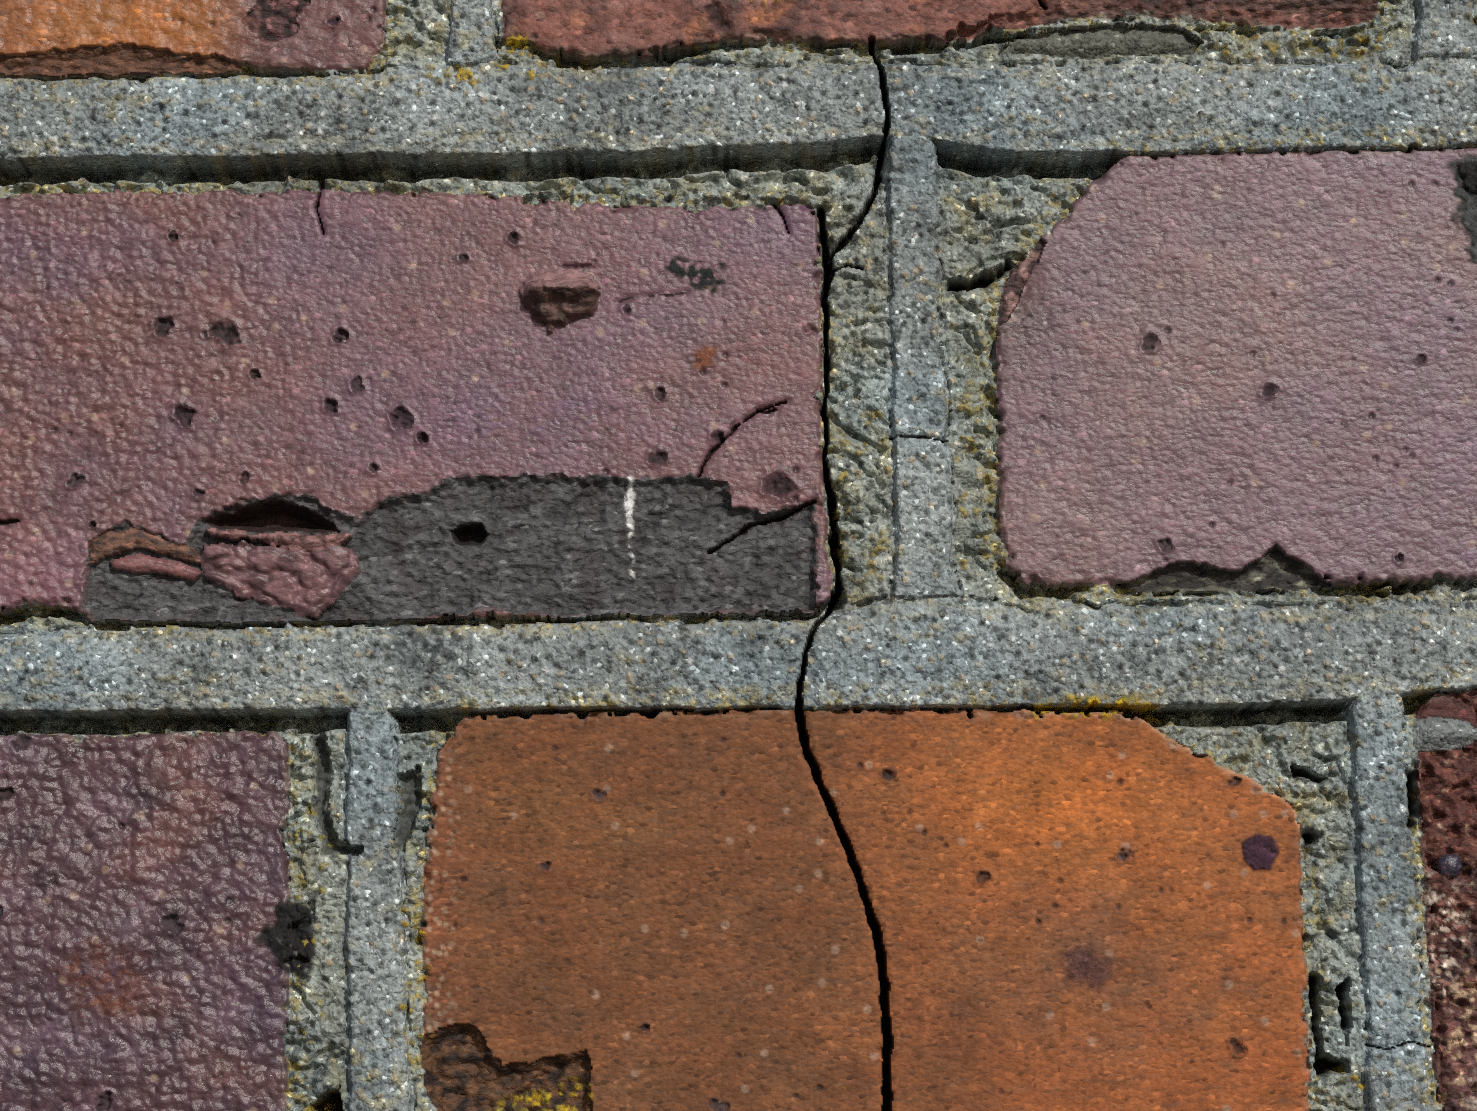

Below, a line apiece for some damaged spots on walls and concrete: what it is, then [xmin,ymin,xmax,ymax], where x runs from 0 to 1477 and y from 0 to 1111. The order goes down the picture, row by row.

spalling [80,452,821,629]
crack [697,37,894,1111]
spalling [1115,539,1333,597]
spalling [421,1025,593,1111]